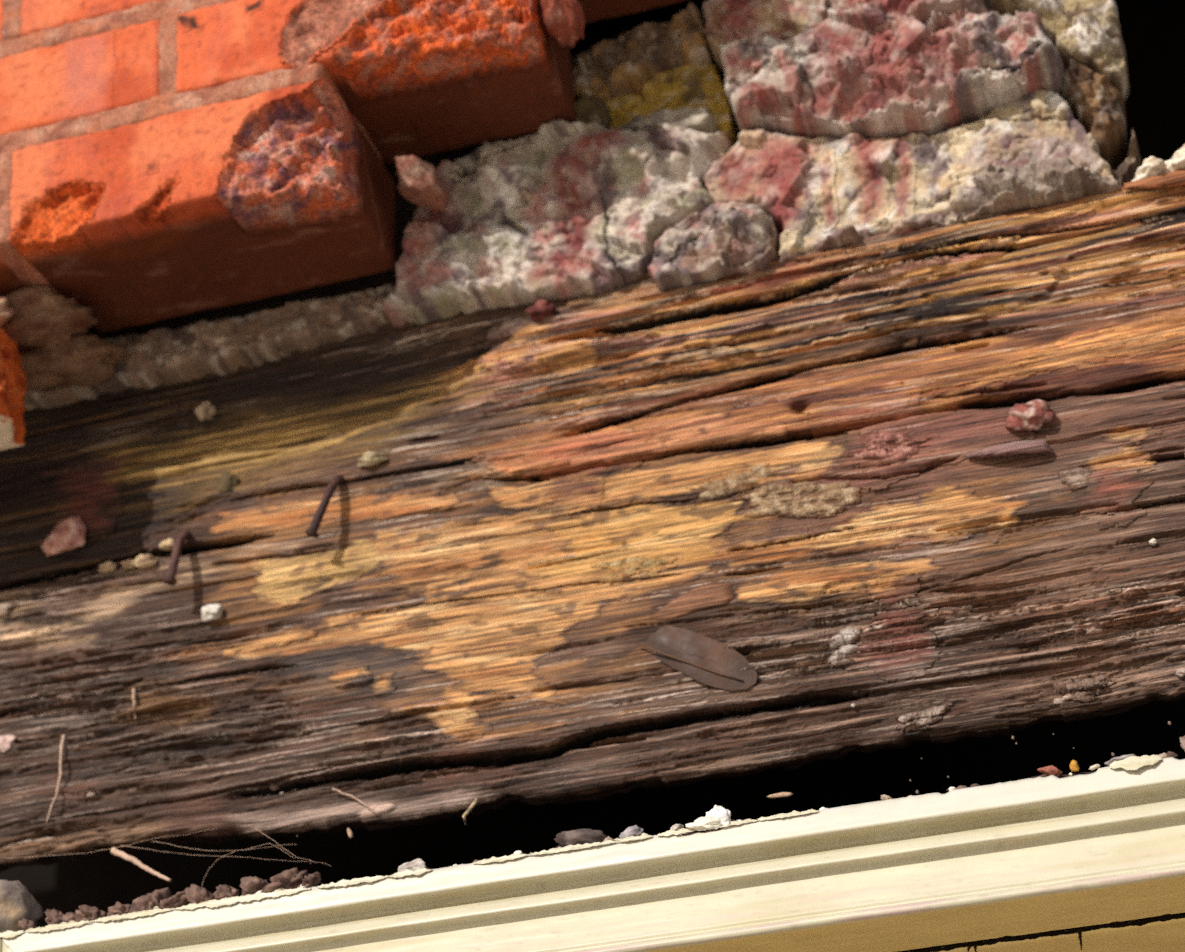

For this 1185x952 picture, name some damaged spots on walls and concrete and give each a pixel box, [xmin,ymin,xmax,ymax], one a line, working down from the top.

spalling [213,0,550,237]
spalling [10,178,105,257]
crack [226,687,886,797]
crack [911,914,1185,952]